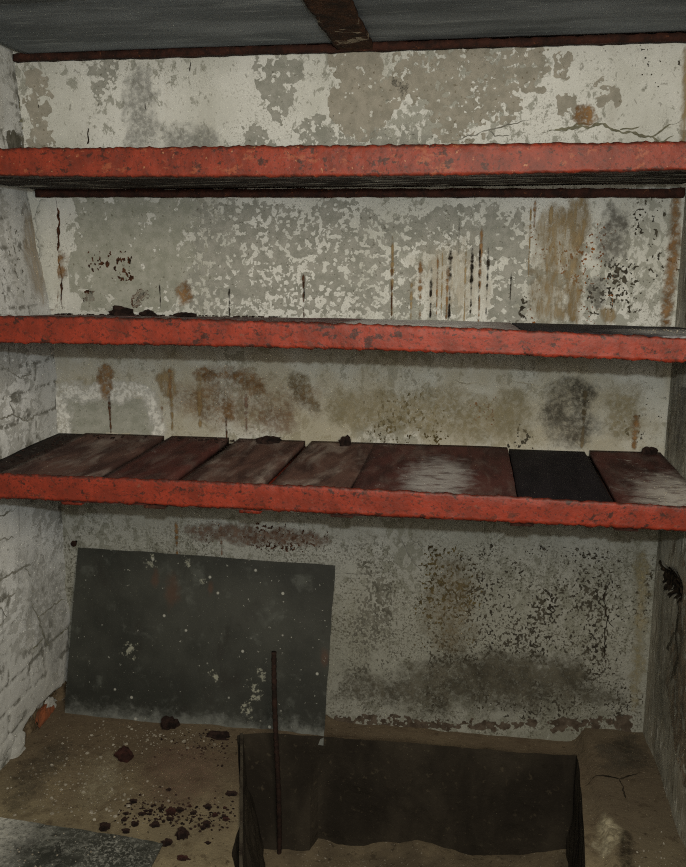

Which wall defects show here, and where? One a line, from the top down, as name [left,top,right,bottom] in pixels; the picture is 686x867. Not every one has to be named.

crack [451,120,525,141]
crack [544,121,680,142]
corrosion [528,198,586,323]
corrosion [661,198,680,325]
corrosion [97,364,113,432]
corrosion [156,369,177,429]
corrosion [197,367,263,429]
leakage [607,394,662,449]
crack [0,563,68,649]
leakage [327,540,654,725]
peeling [659,558,686,787]
flaking render [327,714,633,733]